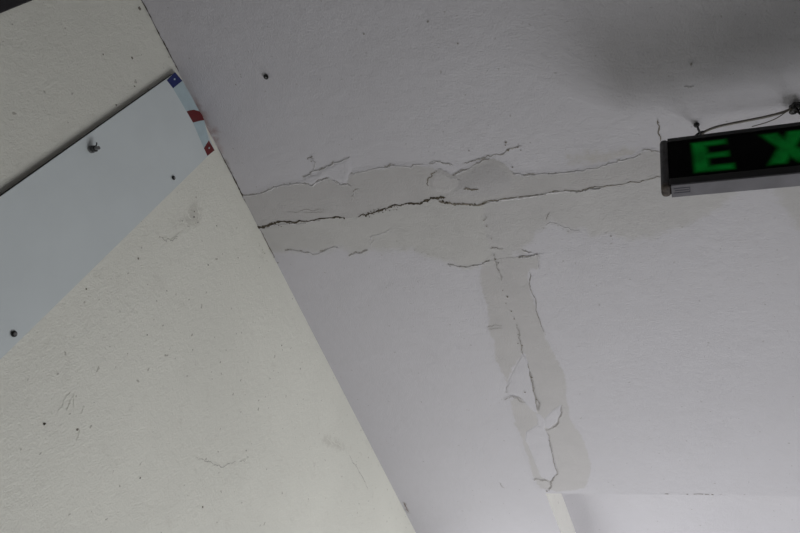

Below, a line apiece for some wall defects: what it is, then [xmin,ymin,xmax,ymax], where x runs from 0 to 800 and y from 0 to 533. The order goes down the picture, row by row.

crack [430,142,521,168]
flaking render [242,146,661,493]
crack [257,176,659,410]
crack [534,434,558,492]